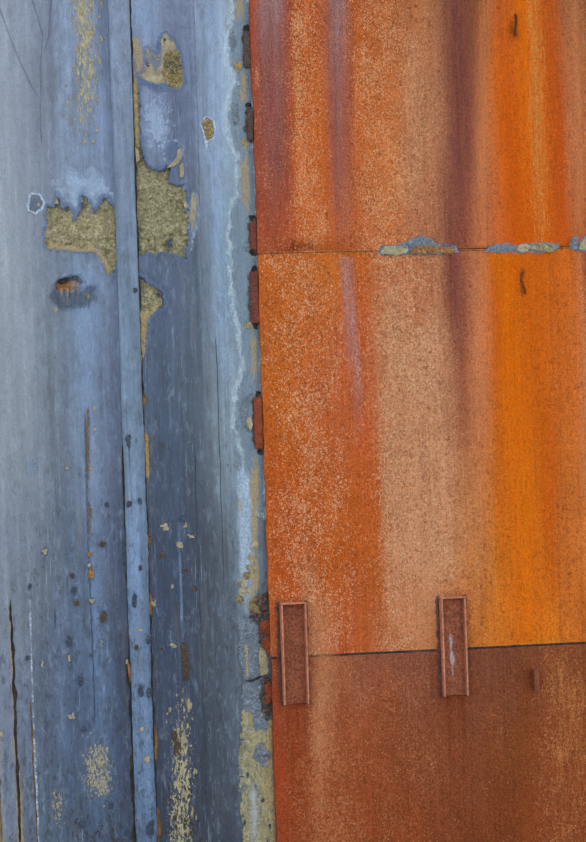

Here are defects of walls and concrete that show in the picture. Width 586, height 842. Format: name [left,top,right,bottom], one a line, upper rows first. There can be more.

peeling [65,0,107,145]
spalling [133,33,189,259]
spalling [37,197,117,275]
peeling [378,235,459,256]
peeling [484,241,560,254]
peeling [570,234,586,252]
spalling [133,278,163,357]
peeling [166,686,200,842]
peeling [237,619,275,842]